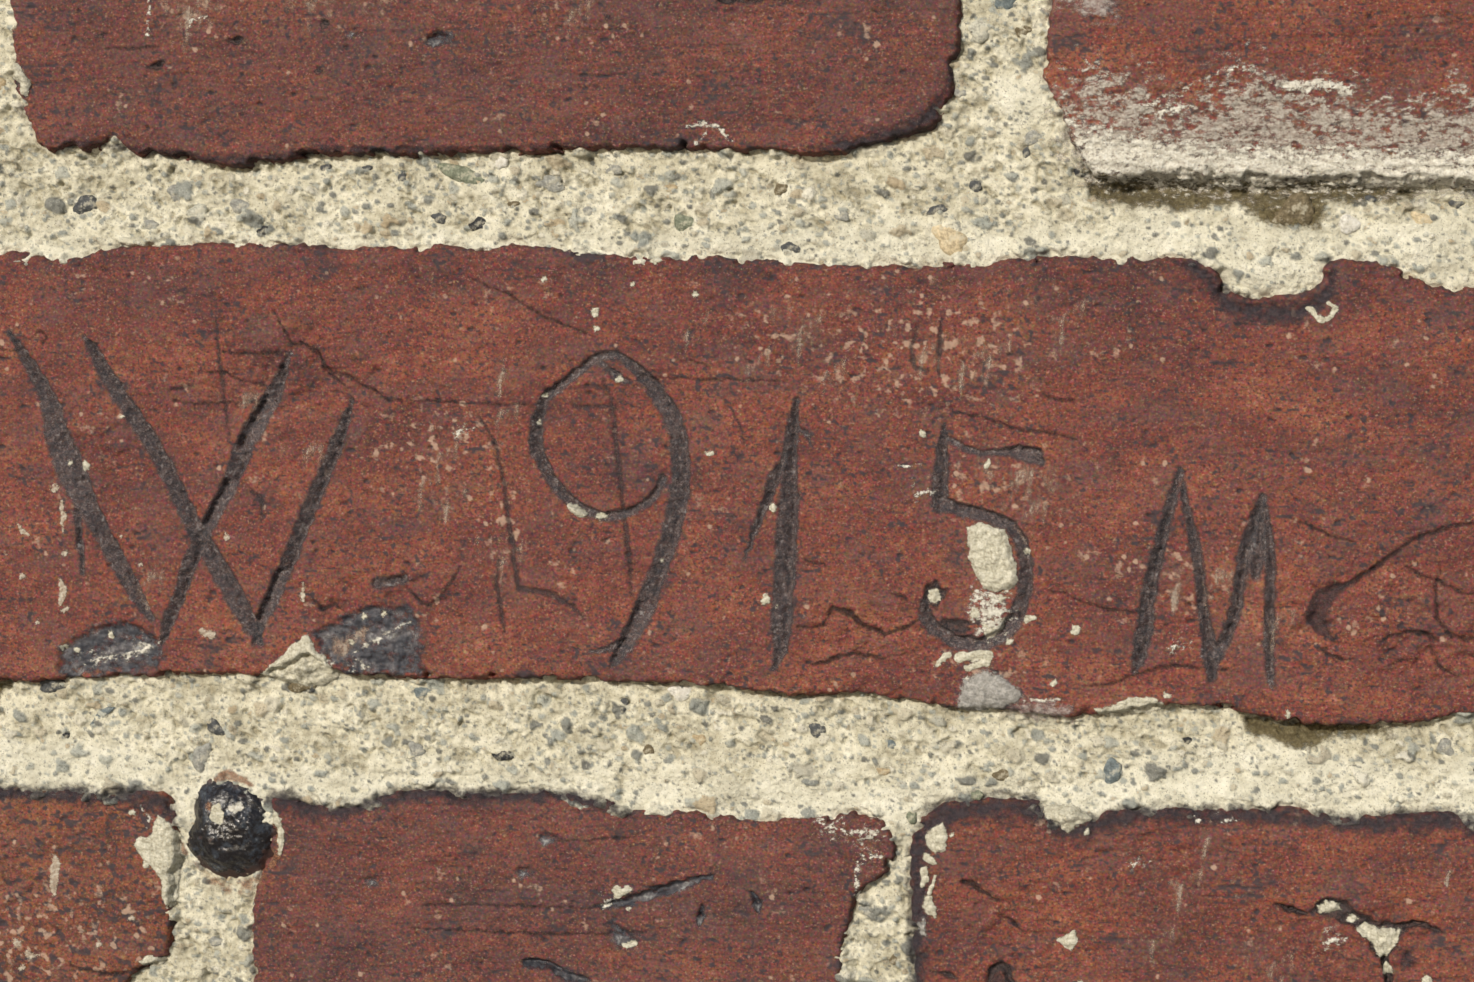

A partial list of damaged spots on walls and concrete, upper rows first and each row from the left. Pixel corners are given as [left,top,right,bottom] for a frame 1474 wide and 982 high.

leakage [1045,60,1474,230]
spalling [924,580,972,634]
crack [1299,522,1474,671]
spalling [1275,897,1442,982]